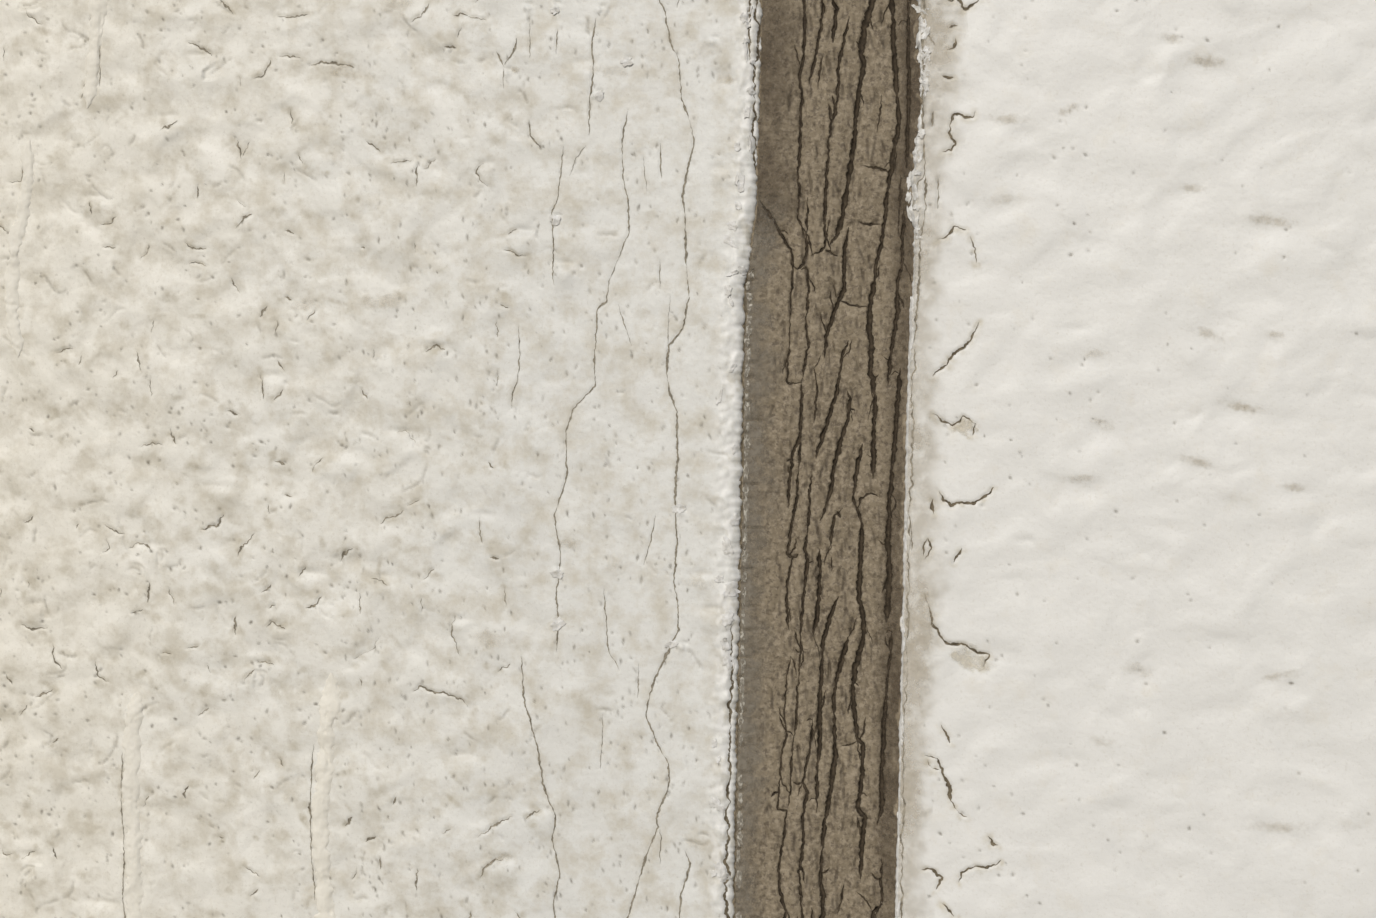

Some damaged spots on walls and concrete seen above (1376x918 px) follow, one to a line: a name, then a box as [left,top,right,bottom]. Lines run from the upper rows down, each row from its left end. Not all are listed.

crack [496,18,558,87]
crack [495,305,520,408]
crack [445,658,560,918]